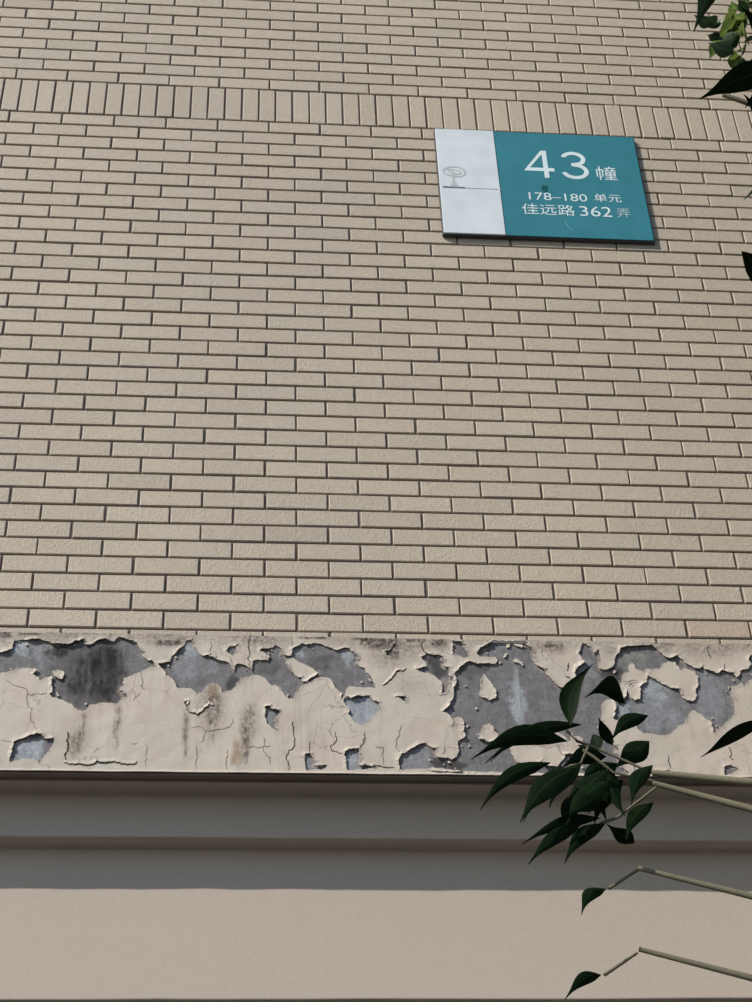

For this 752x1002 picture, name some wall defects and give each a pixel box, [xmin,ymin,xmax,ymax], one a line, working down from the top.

peeling [0,638,380,725]
crack [383,667,406,685]
crack [6,678,46,730]
peeling [10,735,54,763]
crack [64,731,147,766]
peeling [265,707,279,730]
crack [184,698,401,769]
peeling [305,754,326,771]
peeling [344,749,373,770]
peeling [399,642,752,774]